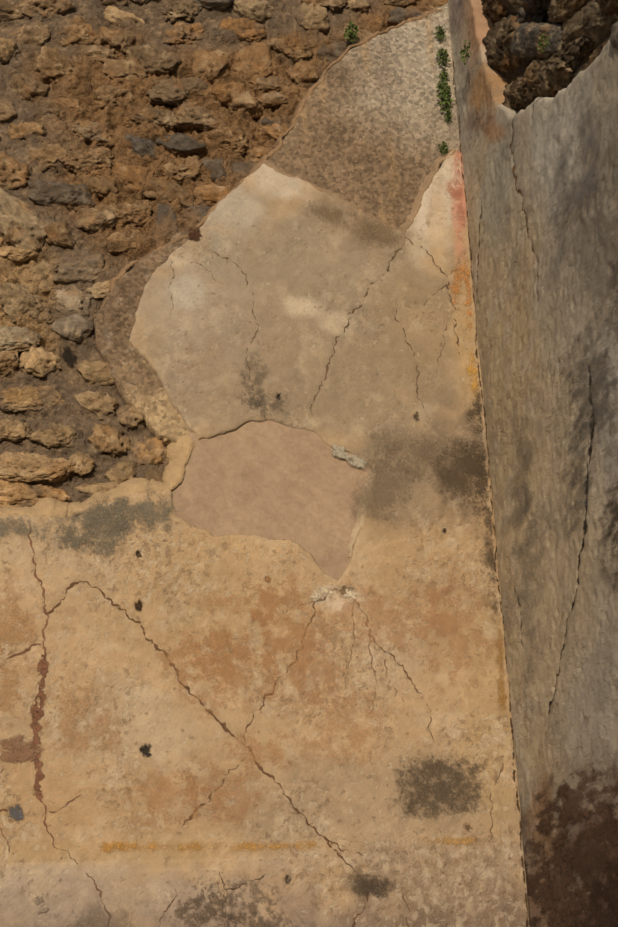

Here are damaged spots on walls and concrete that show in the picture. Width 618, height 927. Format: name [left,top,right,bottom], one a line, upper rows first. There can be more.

flaking render [268,3,460,229]
crack [510,121,538,294]
peeling [94,237,192,442]
crack [170,239,259,400]
flaking render [310,585,358,601]
flaking render [331,444,366,469]
crack [310,62,529,927]
damp [353,393,487,517]
damp [485,508,495,569]
crack [548,365,595,715]
damp [606,486,618,557]
crack [0,522,434,927]